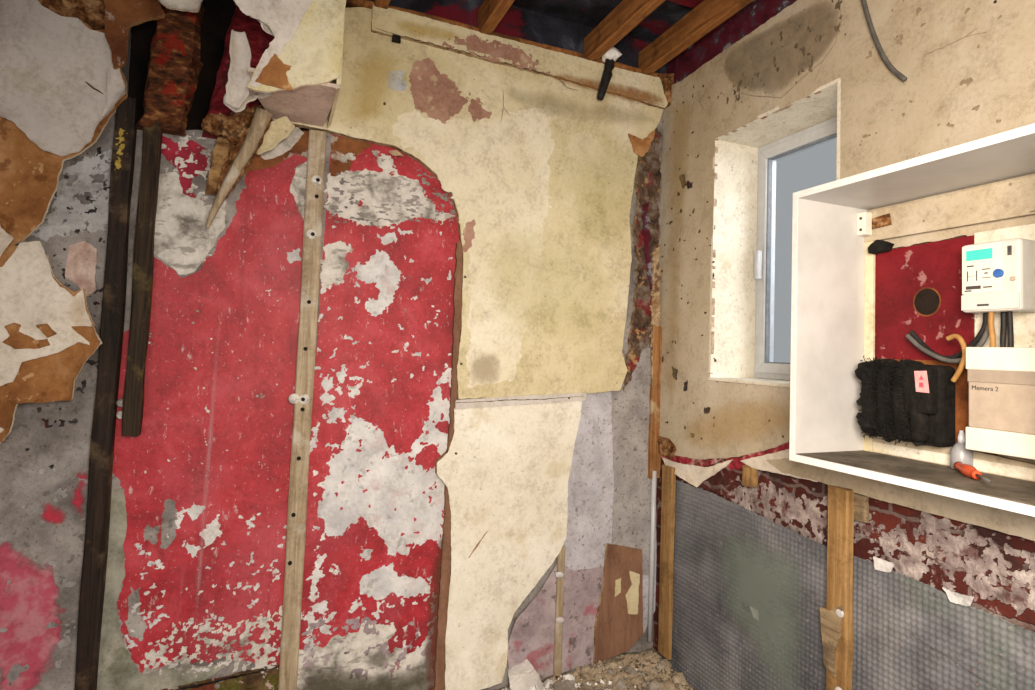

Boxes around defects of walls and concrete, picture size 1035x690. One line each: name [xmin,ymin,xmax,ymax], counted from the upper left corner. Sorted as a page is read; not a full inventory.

damp [771,25,822,83]
peeling [387,58,492,124]
damp [717,73,766,104]
peeling [31,148,112,241]
peeling [154,132,226,275]
peeling [277,248,301,263]
peeling [290,162,307,220]
peeling [320,150,476,317]
peeling [297,324,452,690]